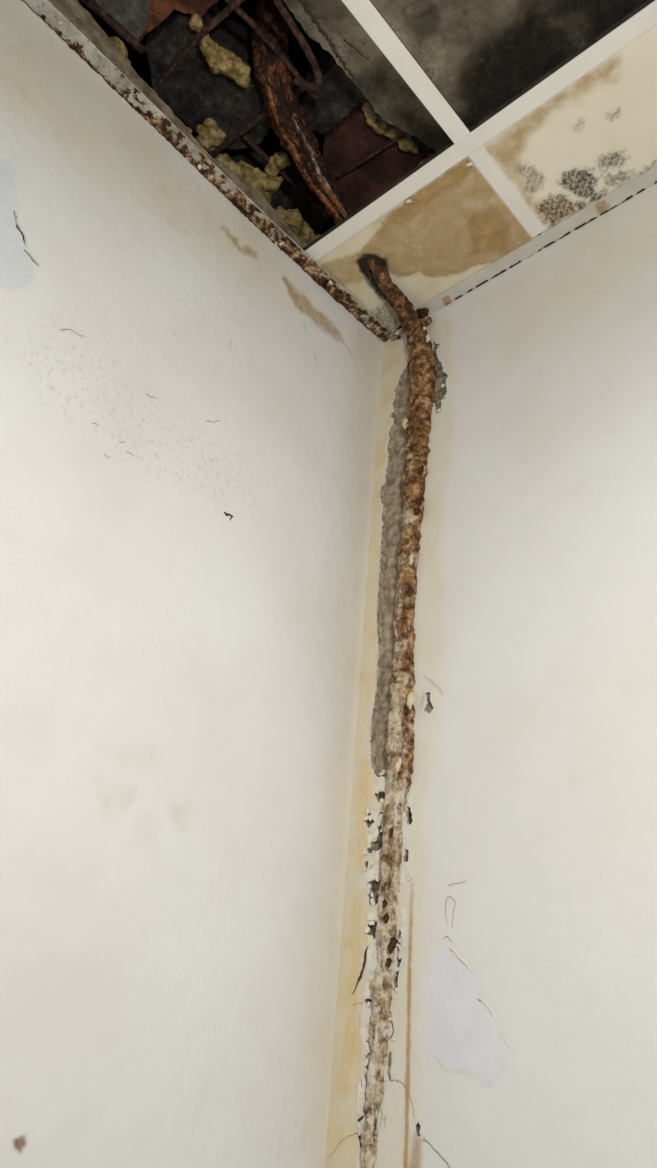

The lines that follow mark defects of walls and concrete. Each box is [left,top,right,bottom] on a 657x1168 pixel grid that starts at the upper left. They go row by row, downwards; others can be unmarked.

peeling [0,154,44,294]
corrosion [21,0,391,341]
leakage [323,158,541,327]
leakage [497,110,544,162]
leakage [461,0,647,129]
leakage [538,153,625,226]
flaking render [423,326,448,413]
leakage [0,0,409,1168]
flaking render [357,370,443,1136]
leakage [374,183,657,1168]
corrosion [404,923,418,1168]
peeling [425,943,515,1097]